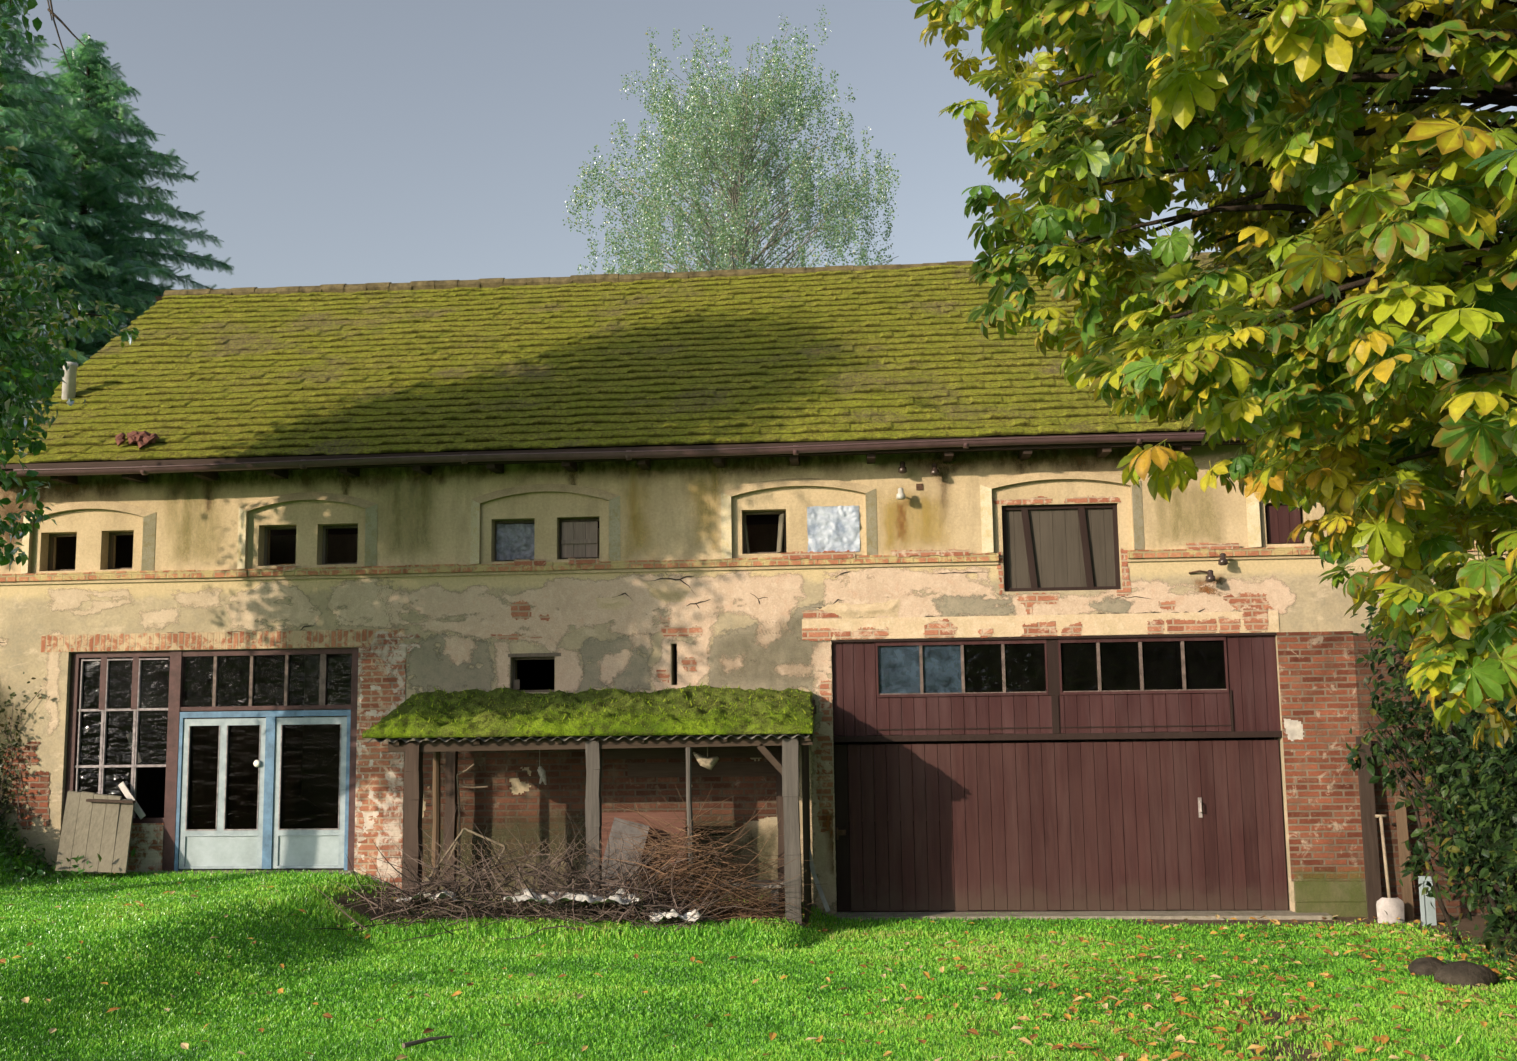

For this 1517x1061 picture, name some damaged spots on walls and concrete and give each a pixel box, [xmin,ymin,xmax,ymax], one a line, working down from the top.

water stain [0,465,492,565]
water stain [521,455,855,496]
water stain [882,447,1170,484]
spalling [2,631,63,830]
flaking render [47,548,1296,911]